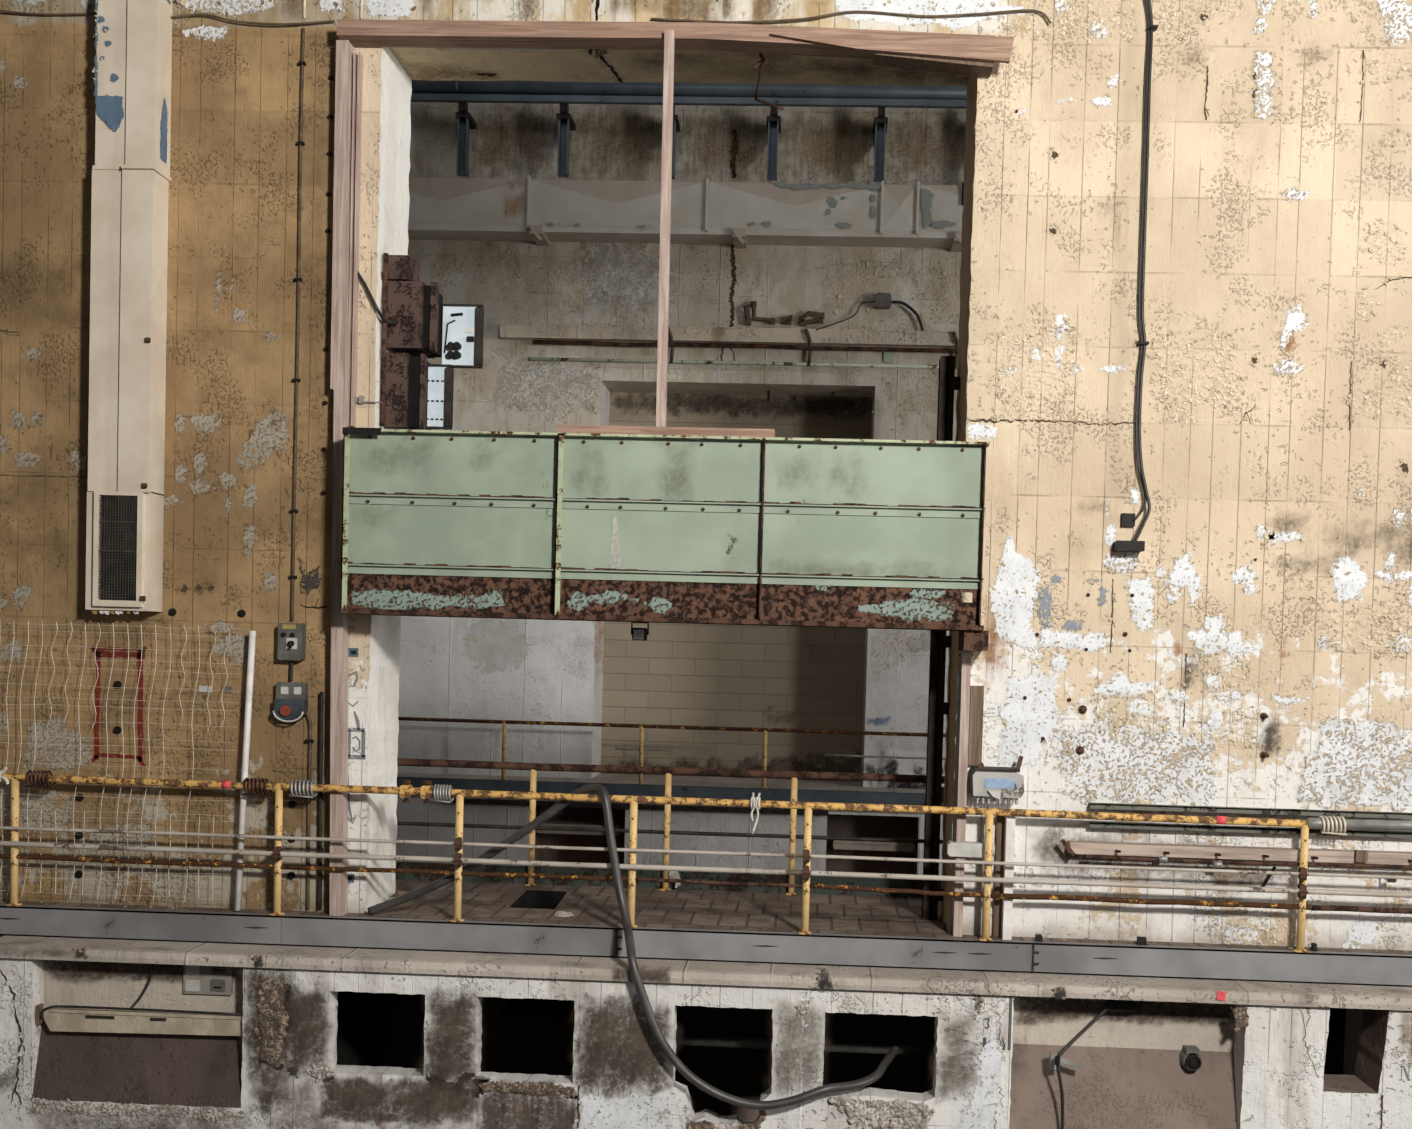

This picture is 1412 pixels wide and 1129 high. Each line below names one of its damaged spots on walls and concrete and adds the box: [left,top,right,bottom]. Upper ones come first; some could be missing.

peeling [167,0,284,42]
crack [588,0,623,83]
peeling [835,0,1138,43]
peeling [1153,0,1321,120]
rust [340,561,983,672]
peeling [989,498,1312,806]
peeling [1317,550,1412,659]
peeling [1293,715,1412,812]
crack [0,970,25,1112]
leakage [245,970,575,1129]
leakage [576,966,670,1097]
spalling [828,1093,935,1129]